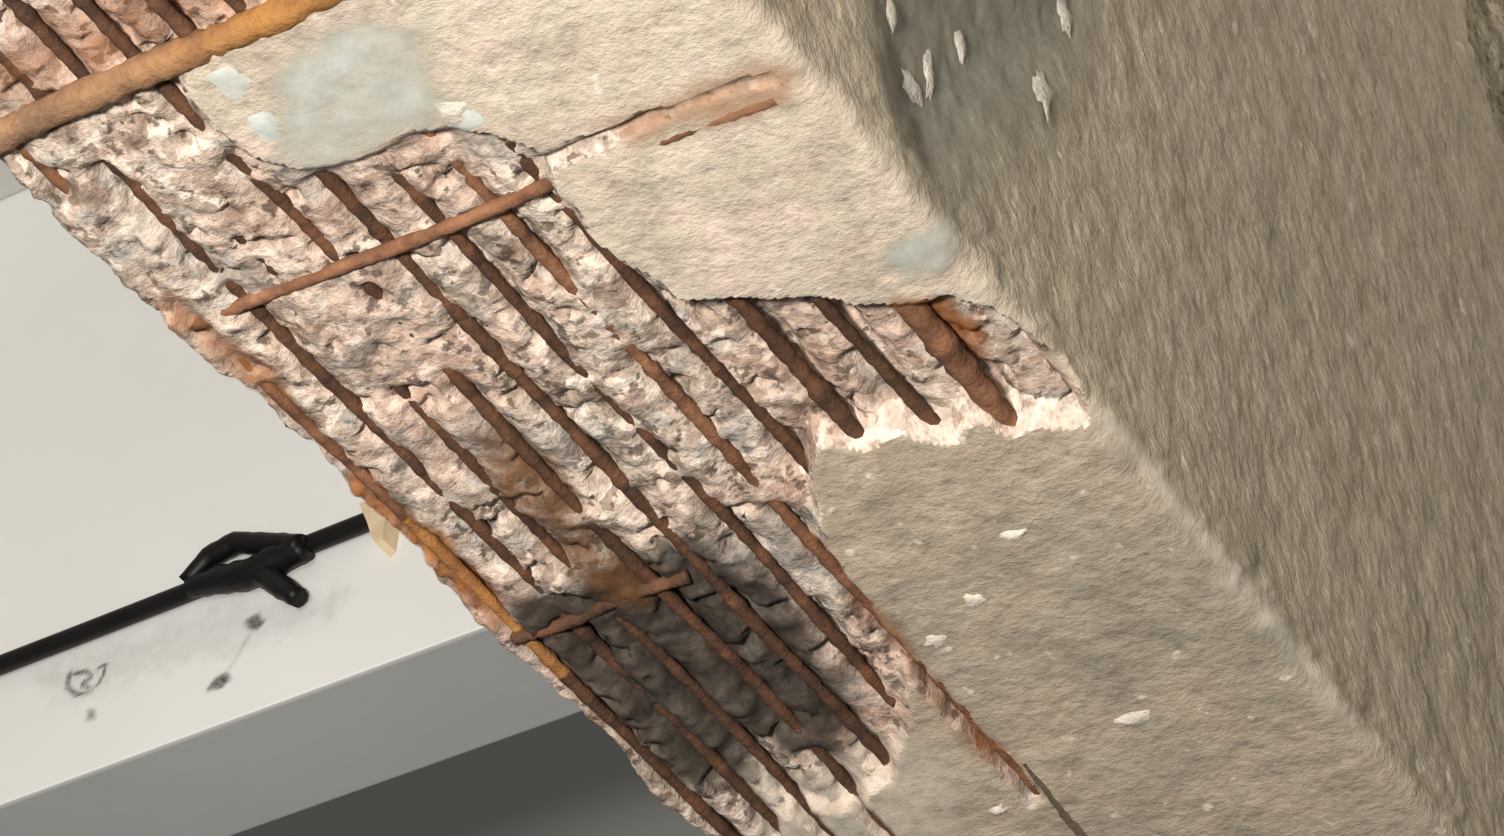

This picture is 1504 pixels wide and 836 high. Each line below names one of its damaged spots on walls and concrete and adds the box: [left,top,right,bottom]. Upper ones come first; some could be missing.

spalling [0,0,267,118]
spalling [1465,0,1504,144]
corrosion [904,296,981,352]
spalling [0,25,1091,836]
corrosion [348,477,495,607]
corrosion [490,436,652,597]
water stain [511,538,854,786]
peeling [1113,710,1150,728]
crack [1022,763,1088,836]